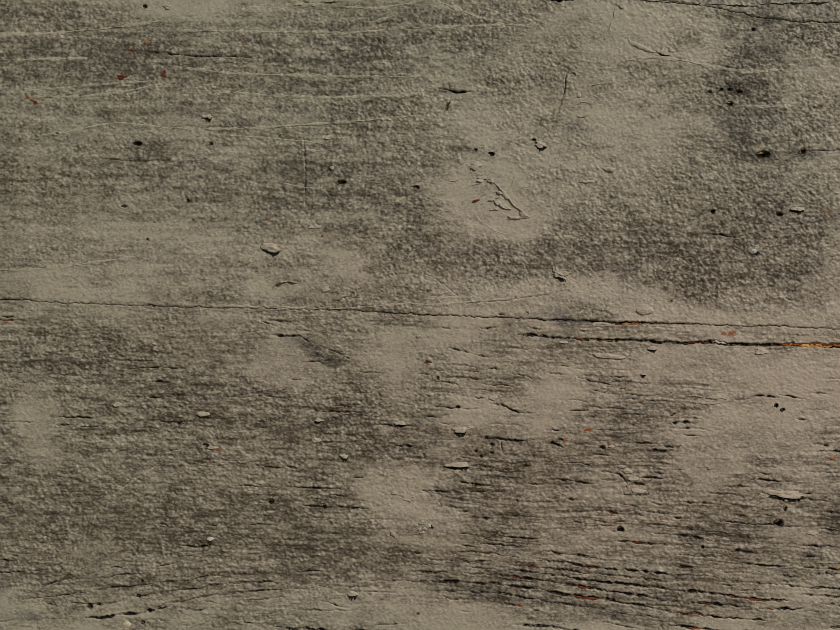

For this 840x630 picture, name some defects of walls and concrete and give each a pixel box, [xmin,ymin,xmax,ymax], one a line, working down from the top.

peeling [448,160,531,219]
crack [0,299,381,413]
crack [58,416,209,436]
crack [240,465,364,509]
crack [314,274,840,630]
crack [0,525,342,630]